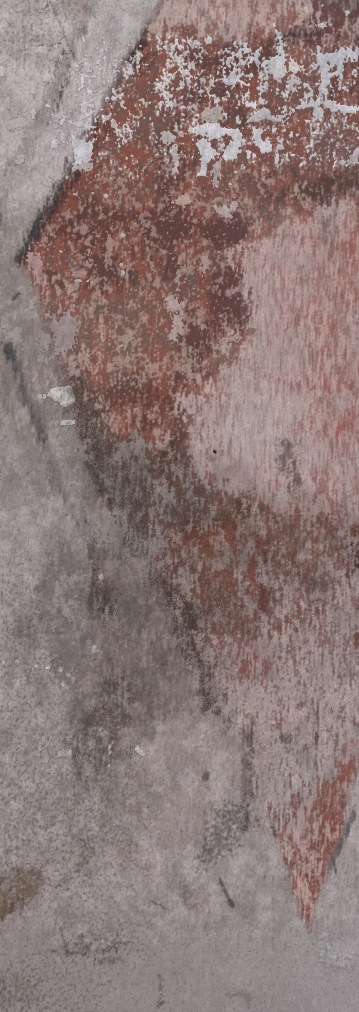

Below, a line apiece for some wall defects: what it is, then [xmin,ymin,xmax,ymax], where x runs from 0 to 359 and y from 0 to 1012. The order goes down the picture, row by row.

peeling [0,23,359,188]
peeling [171,193,192,209]
spalling [37,386,75,407]